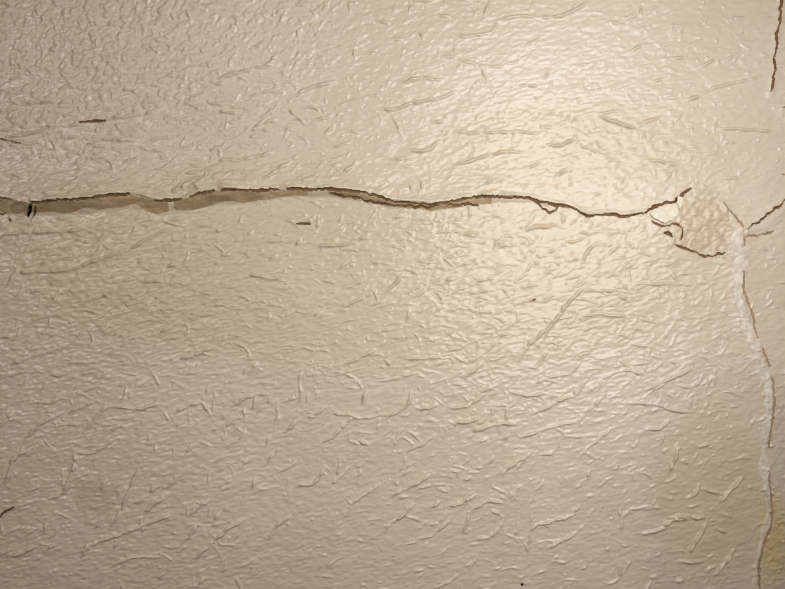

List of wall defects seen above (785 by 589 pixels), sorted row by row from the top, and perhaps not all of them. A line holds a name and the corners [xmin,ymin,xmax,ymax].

crack [768,0,785,108]
crack [0,184,726,258]
peeling [650,196,683,223]
crack [724,199,785,237]